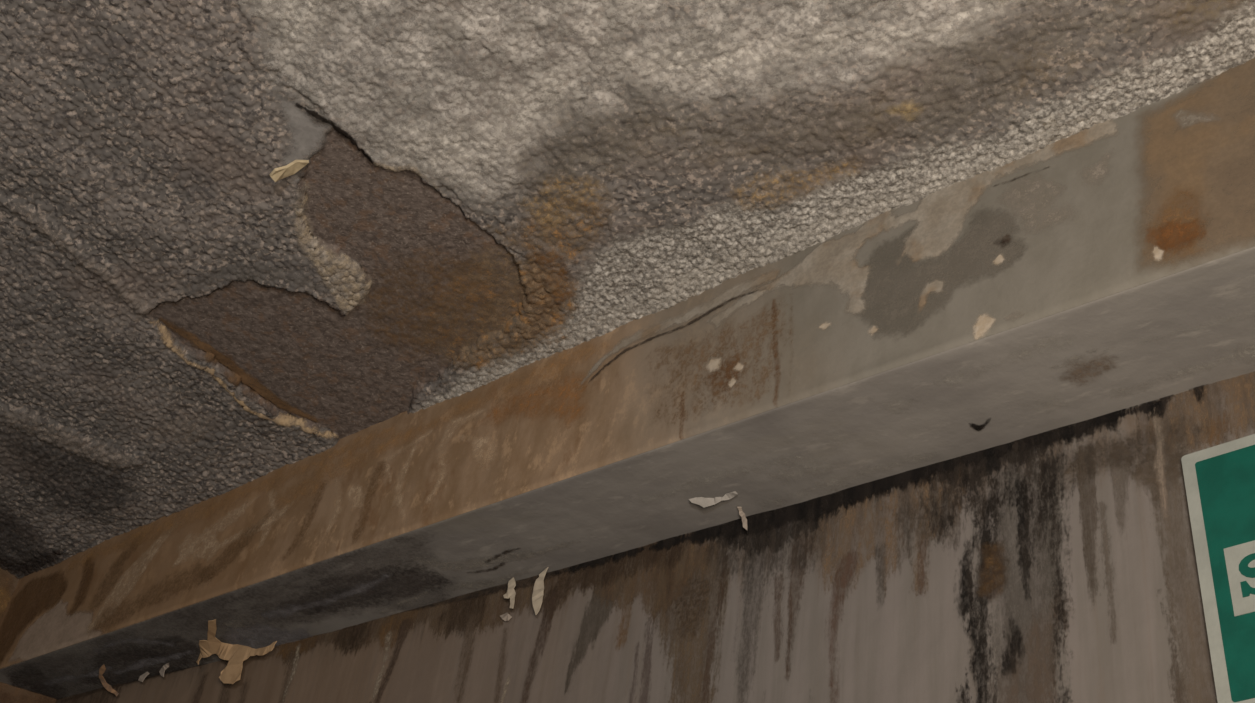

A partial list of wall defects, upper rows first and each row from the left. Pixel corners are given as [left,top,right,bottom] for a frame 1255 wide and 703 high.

flaking render [148,99,525,441]
crack [587,270,779,380]
leakage [243,0,1255,419]
peeling [707,120,1118,327]
peeling [973,314,1017,339]
peeling [197,619,277,684]
peeling [500,577,516,621]
peeling [532,567,549,615]
leakage [0,371,1255,703]
peeling [689,491,748,530]